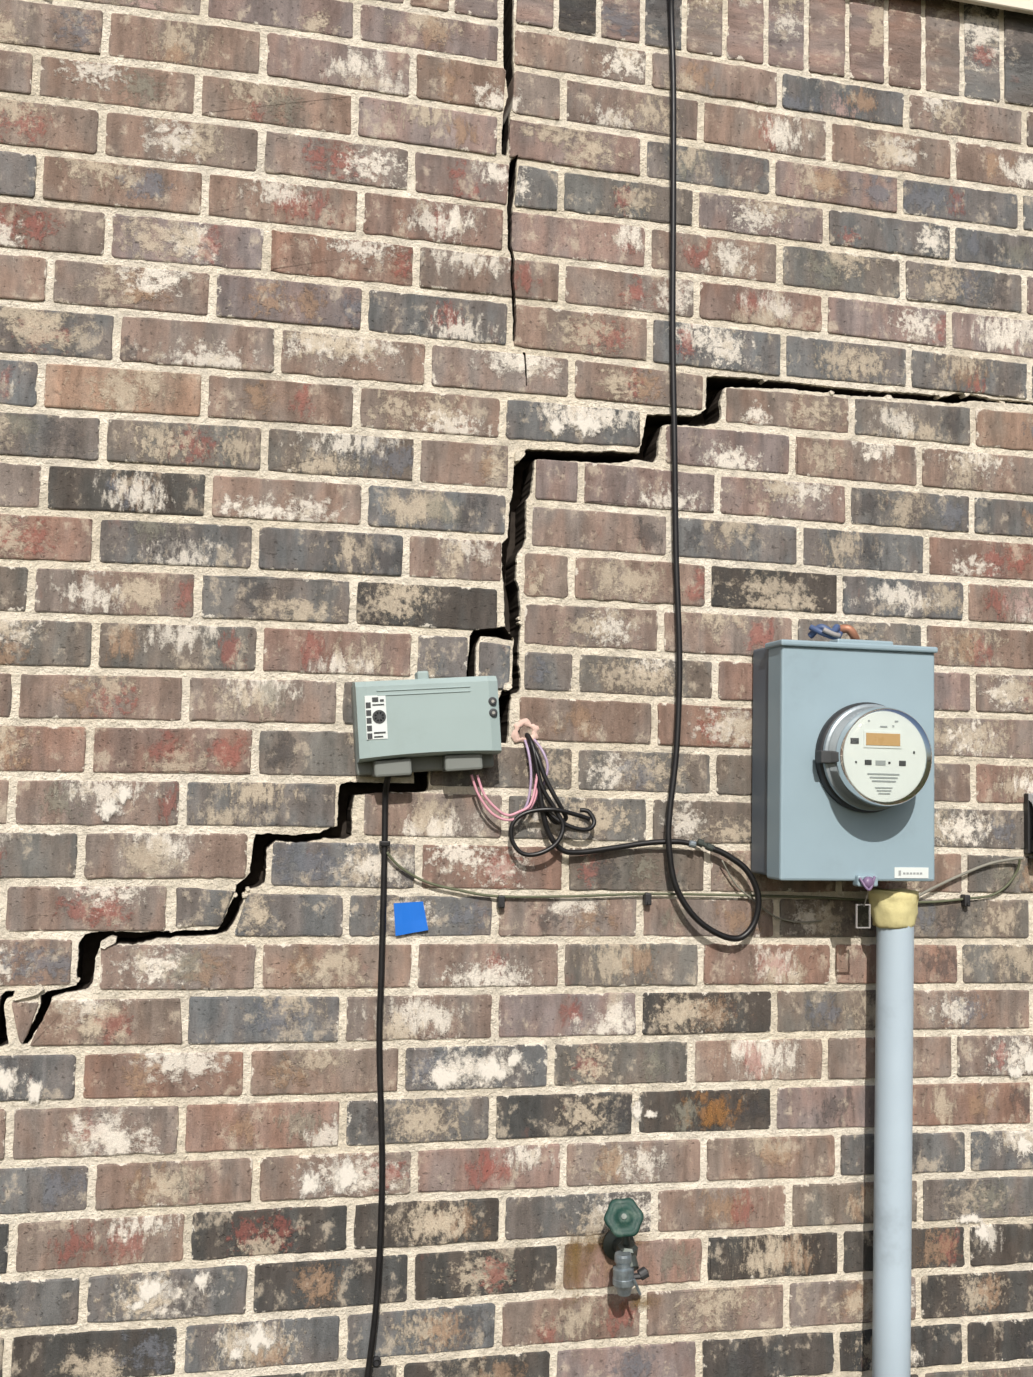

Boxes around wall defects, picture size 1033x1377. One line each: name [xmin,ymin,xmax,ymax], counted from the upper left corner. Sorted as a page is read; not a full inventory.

crack [501,0,526,376]
crack [466,377,1033,743]
crack [0,771,428,1046]